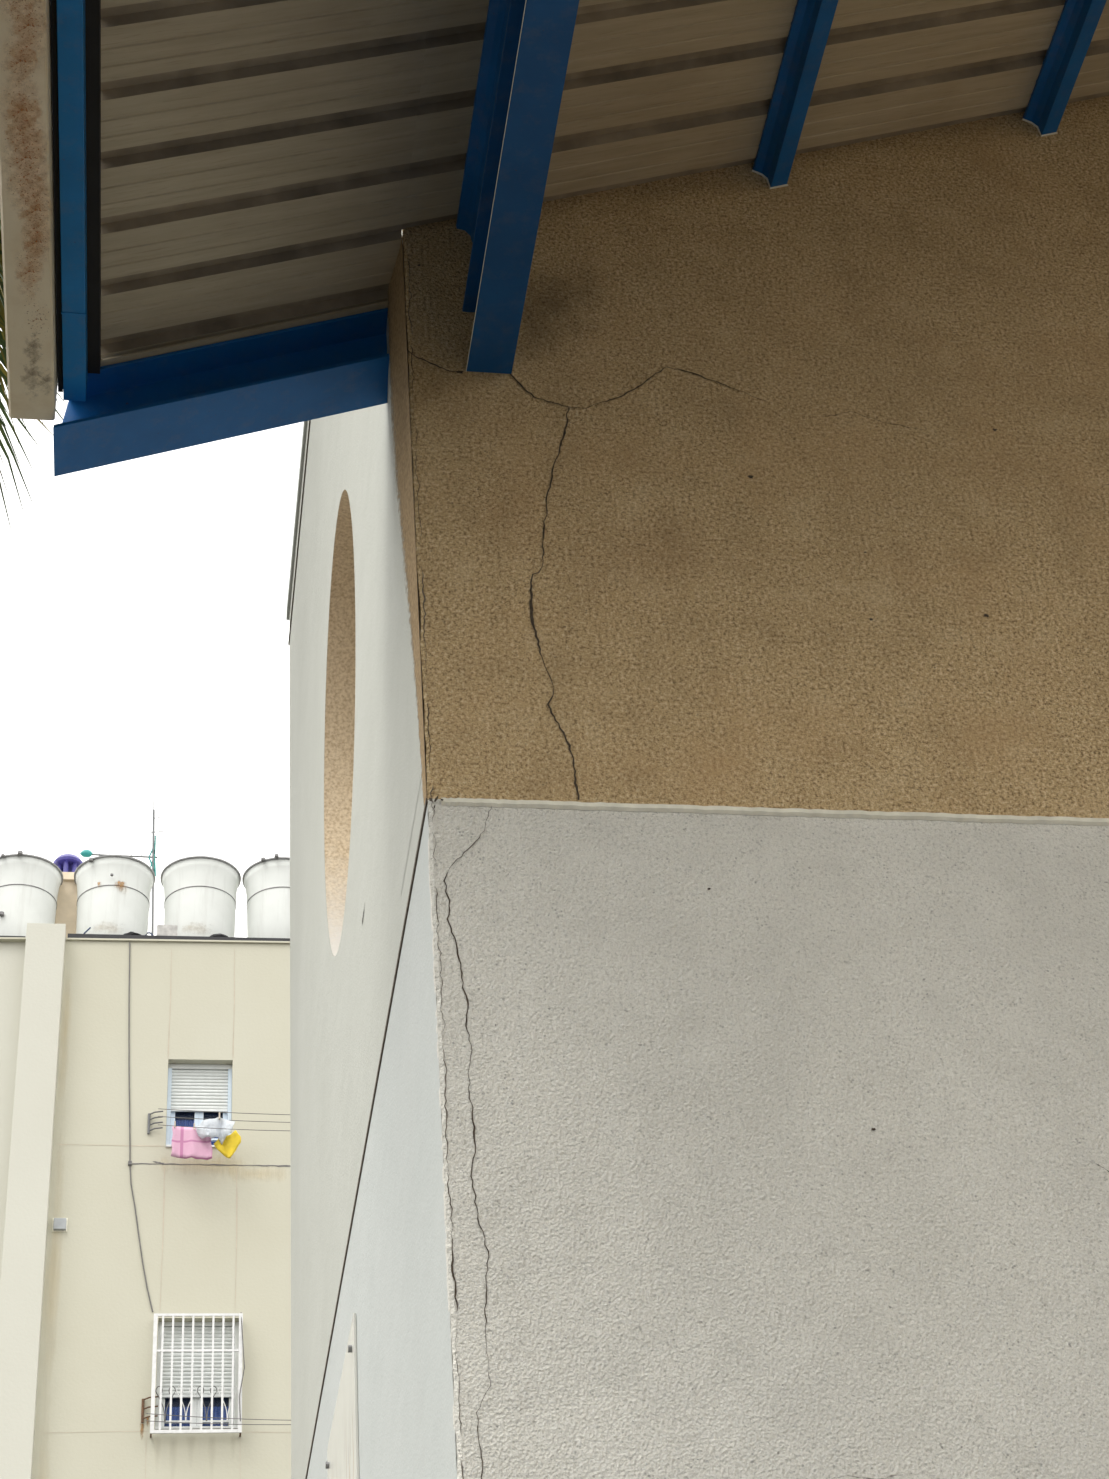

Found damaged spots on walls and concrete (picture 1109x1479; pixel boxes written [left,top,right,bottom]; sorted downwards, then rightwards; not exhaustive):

crack [407,262,492,1479]
crack [510,367,765,800]